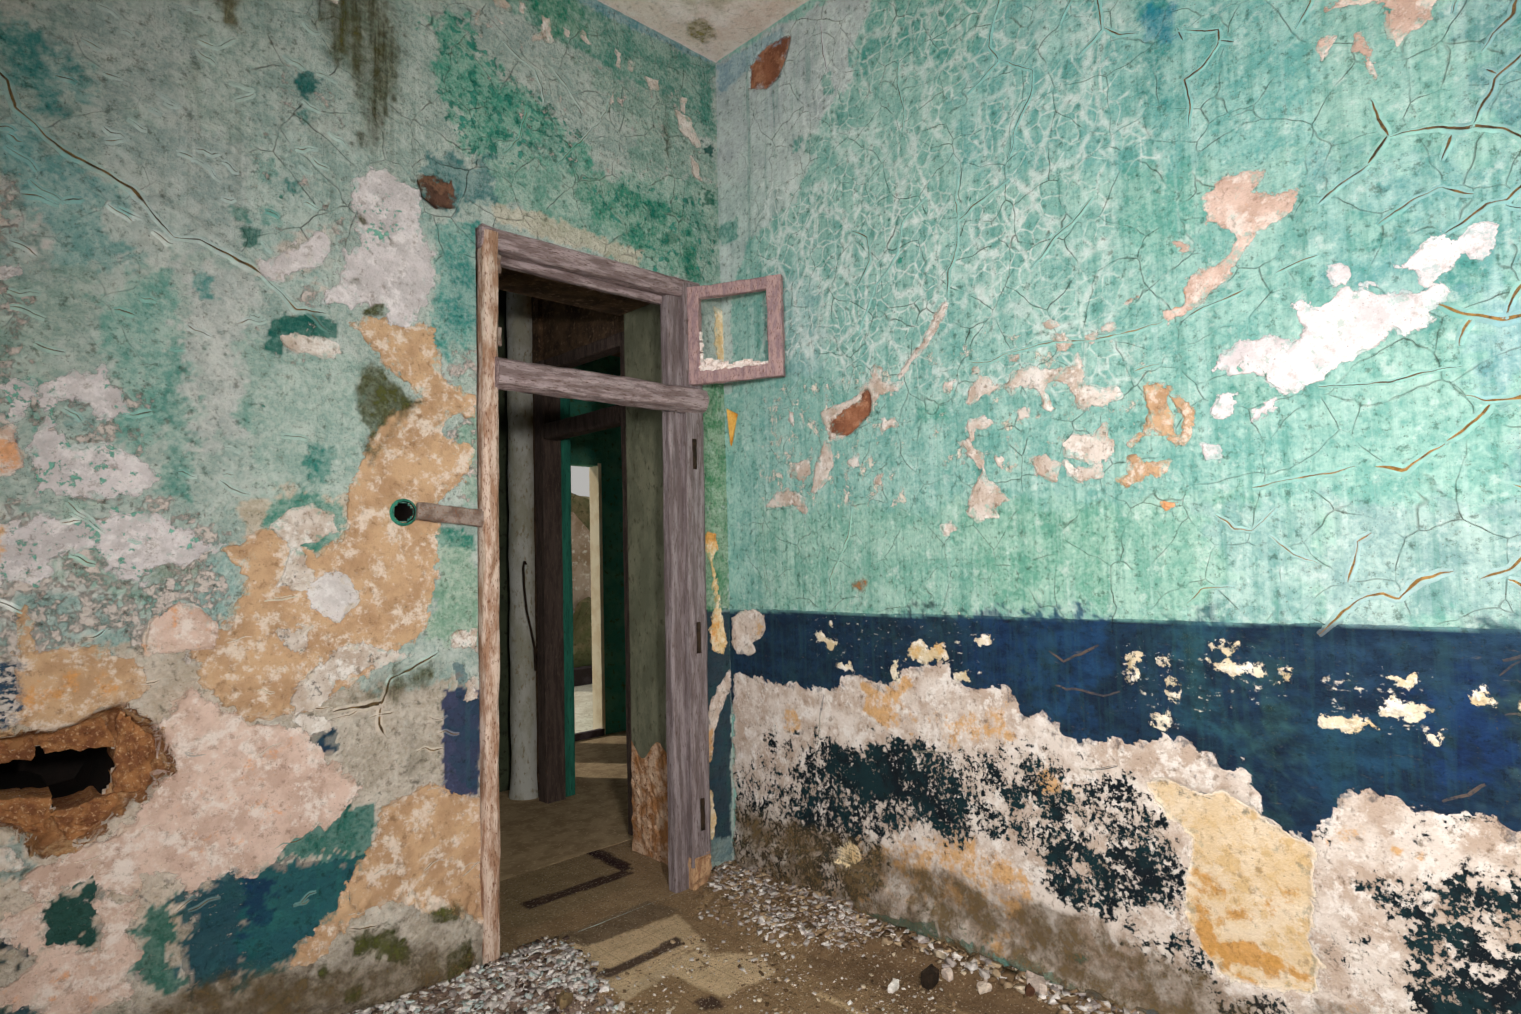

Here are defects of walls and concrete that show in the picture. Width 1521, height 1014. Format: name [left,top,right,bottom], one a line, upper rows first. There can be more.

crack [0,2,350,356]
damp [217,0,238,25]
peeling [0,166,484,1014]
damp [319,0,399,141]
peeling [766,301,948,515]
crack [851,0,1035,334]
crack [1176,0,1234,129]
peeling [939,221,1499,537]
peeling [1163,169,1300,325]
crack [1214,280,1521,637]
crack [1317,0,1521,235]
peeling [705,532,1521,1014]